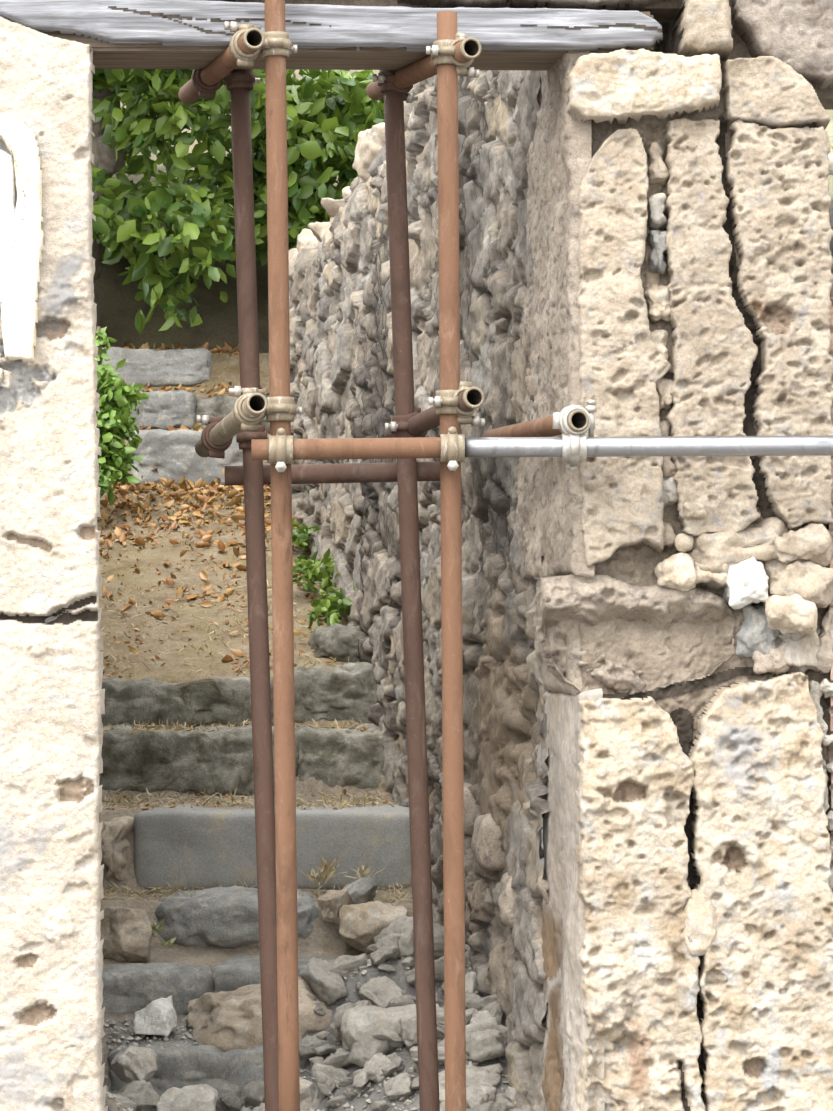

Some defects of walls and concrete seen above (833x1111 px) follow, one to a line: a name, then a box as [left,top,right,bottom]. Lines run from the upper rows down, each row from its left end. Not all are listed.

peeling [0,113,70,412]
crack [717,116,776,519]
crack [0,596,98,625]
crack [603,667,788,757]
crack [684,788,699,890]
crack [678,966,705,1111]